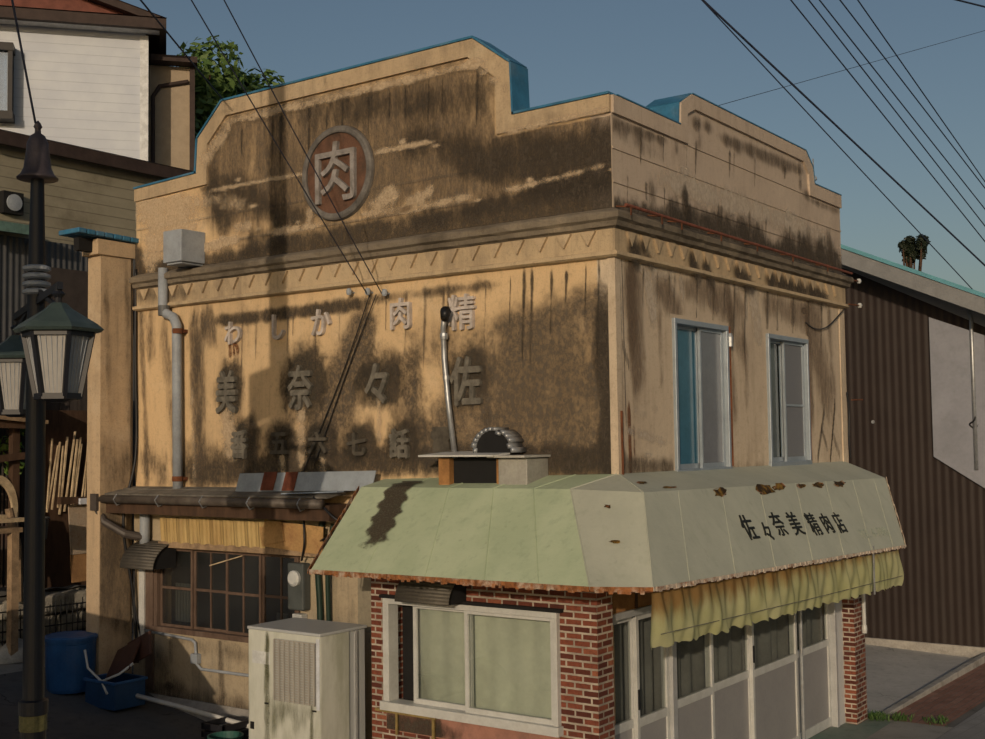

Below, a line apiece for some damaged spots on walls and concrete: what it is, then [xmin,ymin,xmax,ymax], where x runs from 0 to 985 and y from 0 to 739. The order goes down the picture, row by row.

damp [204,63,664,254]
damp [682,186,690,227]
damp [724,135,819,204]
damp [183,268,611,487]
damp [620,261,831,416]
damp [624,453,673,474]
damp [100,511,130,629]